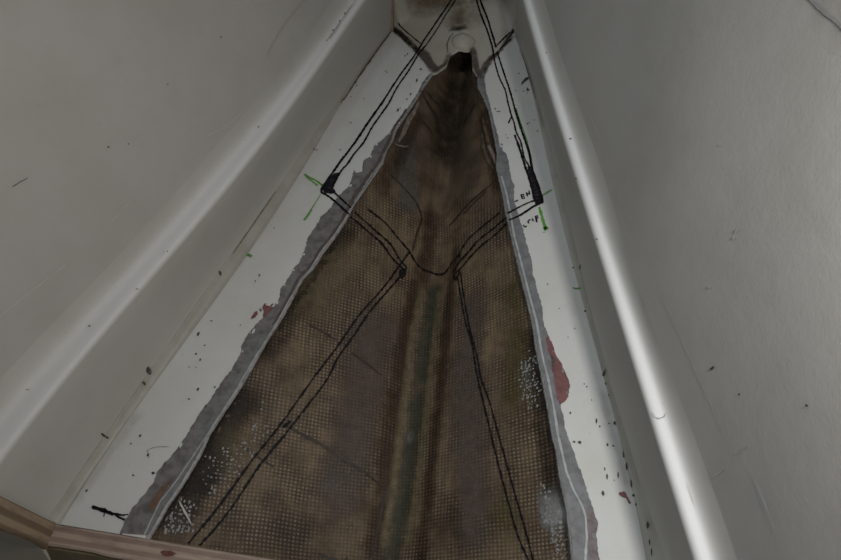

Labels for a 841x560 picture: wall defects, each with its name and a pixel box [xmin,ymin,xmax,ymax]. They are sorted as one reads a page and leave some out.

peeling [120,68,429,535]
peeling [472,63,600,560]